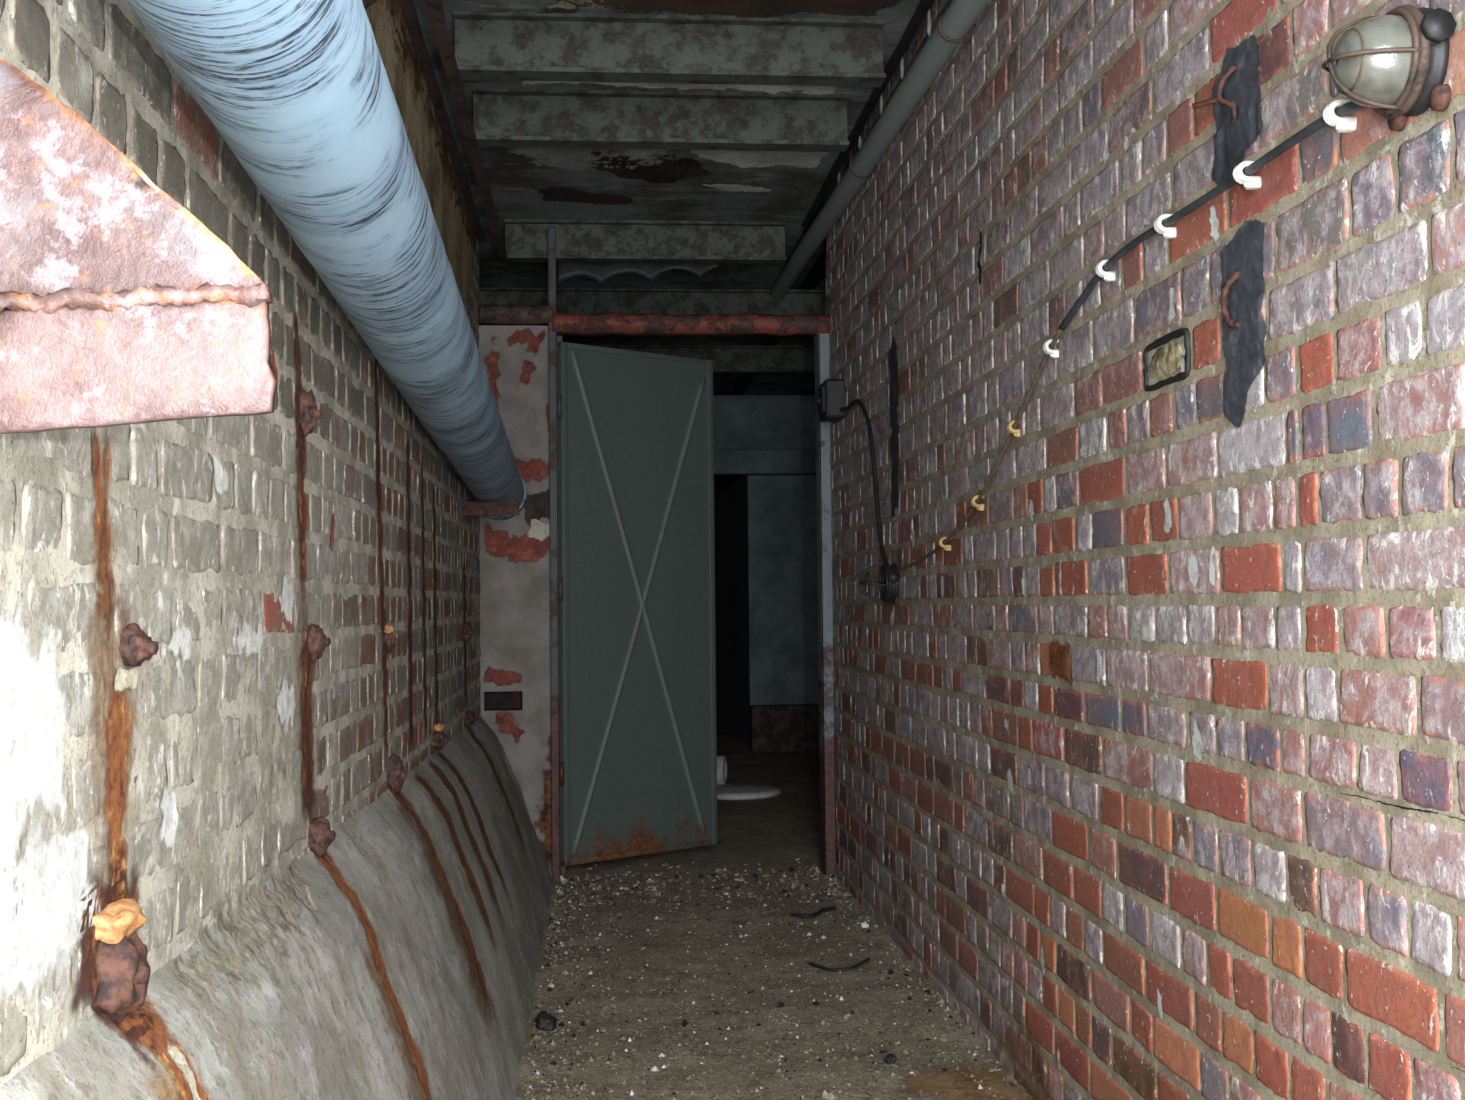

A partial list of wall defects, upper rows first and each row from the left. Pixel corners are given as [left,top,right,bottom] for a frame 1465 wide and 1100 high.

peeling [484,328,546,407]
corrosion [73,433,209,1100]
corrosion [294,313,316,818]
corrosion [315,853,432,1100]
corrosion [375,357,388,749]
corrosion [406,442,439,737]
corrosion [389,753,506,1018]
peeling [483,666,522,686]
peeling [496,711,524,743]
peeling [484,458,550,563]
crack [1341,793,1465,821]